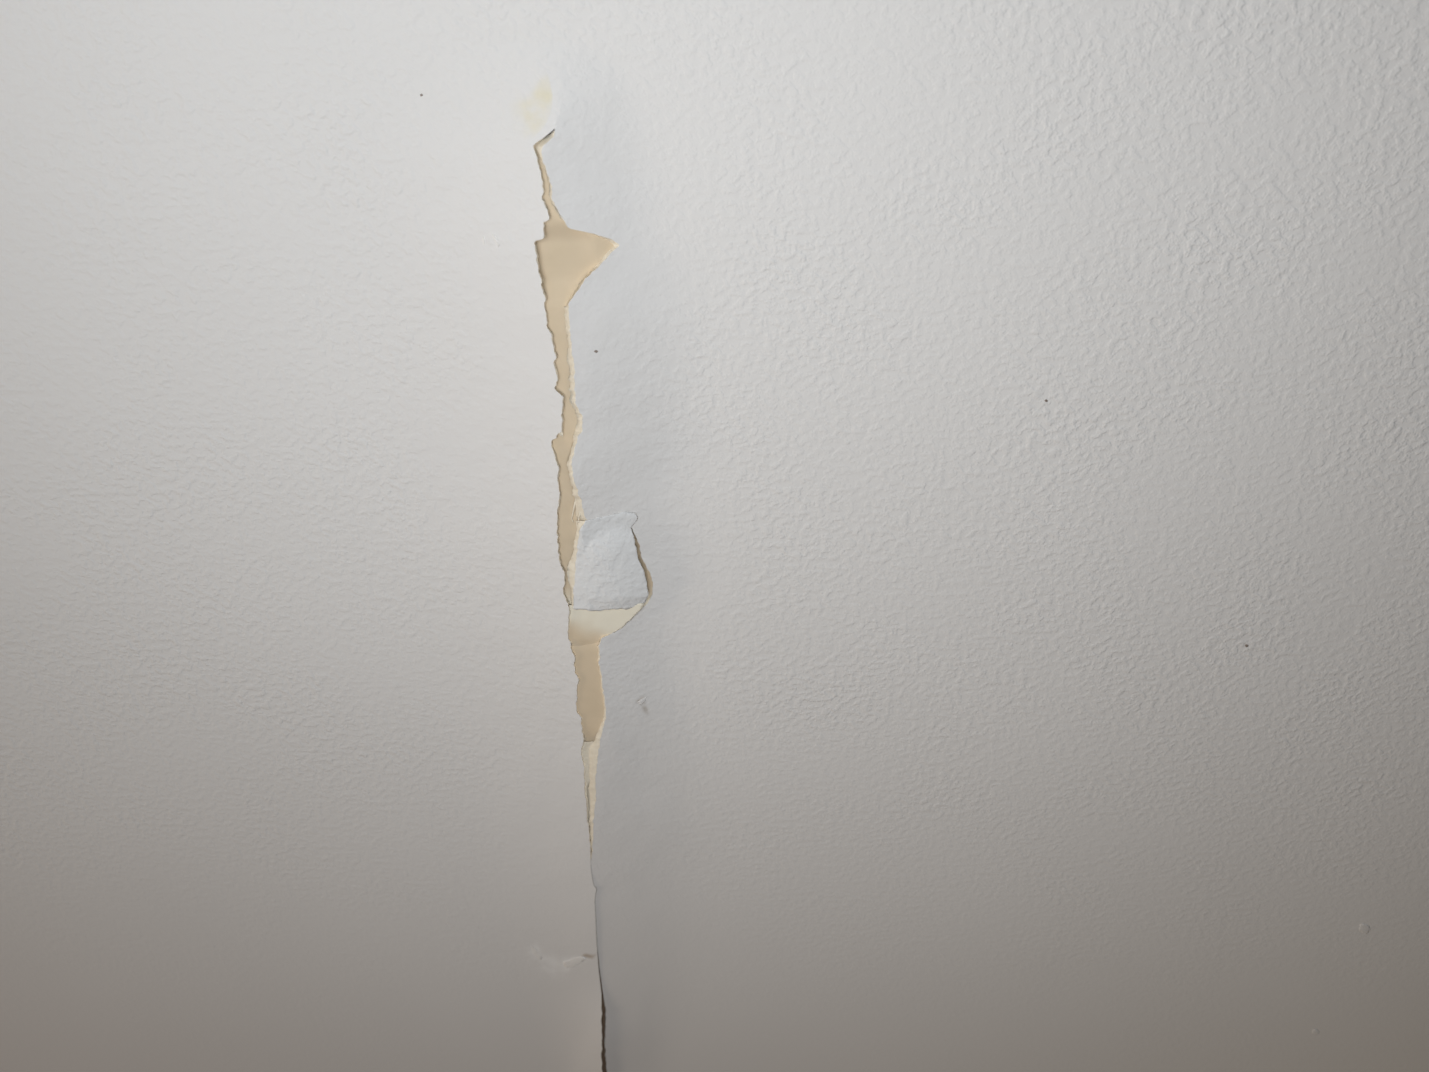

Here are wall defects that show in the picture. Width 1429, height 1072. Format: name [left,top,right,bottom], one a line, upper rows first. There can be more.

crack [580,872,607,1072]